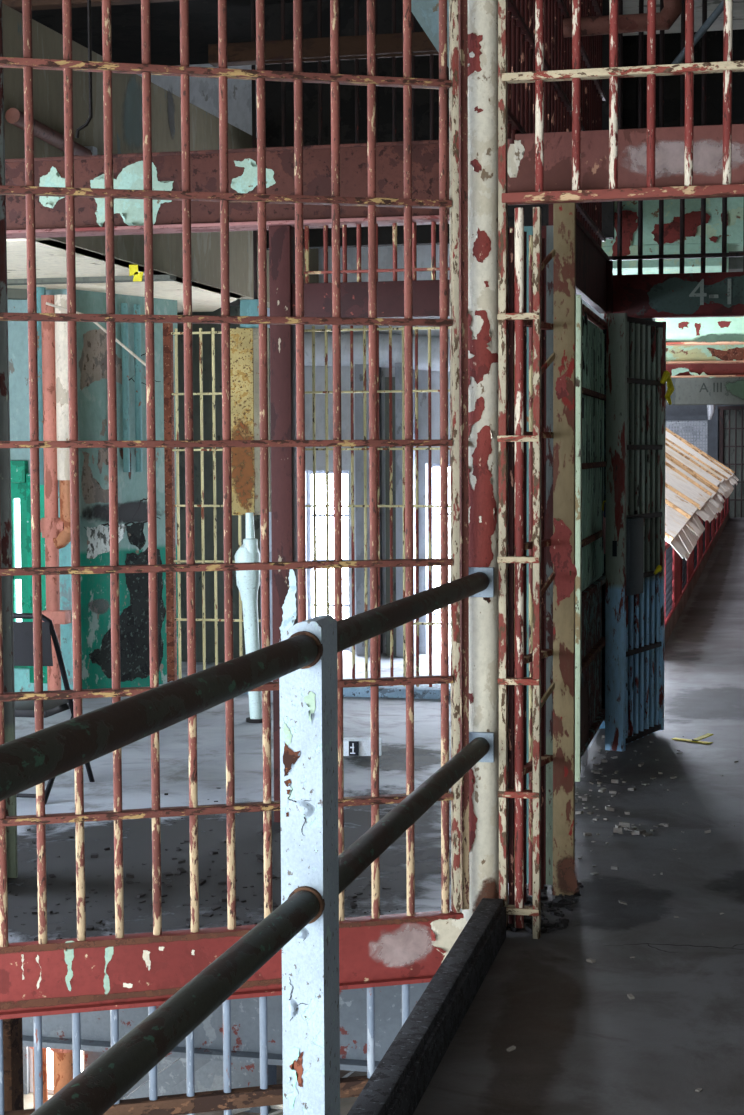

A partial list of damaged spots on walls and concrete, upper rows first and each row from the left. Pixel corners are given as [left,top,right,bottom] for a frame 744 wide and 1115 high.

peeling [39,166,65,208]
peeling [90,161,173,227]
peeling [231,158,276,193]
peeling [473,228,491,263]
peeling [468,310,498,567]
corrosion [231,421,255,512]
flaking render [87,522,166,682]
damp [577,878,668,929]
peeling [64,941,74,991]
peeling [103,947,133,994]
peeling [143,947,164,970]
peeling [430,918,467,964]